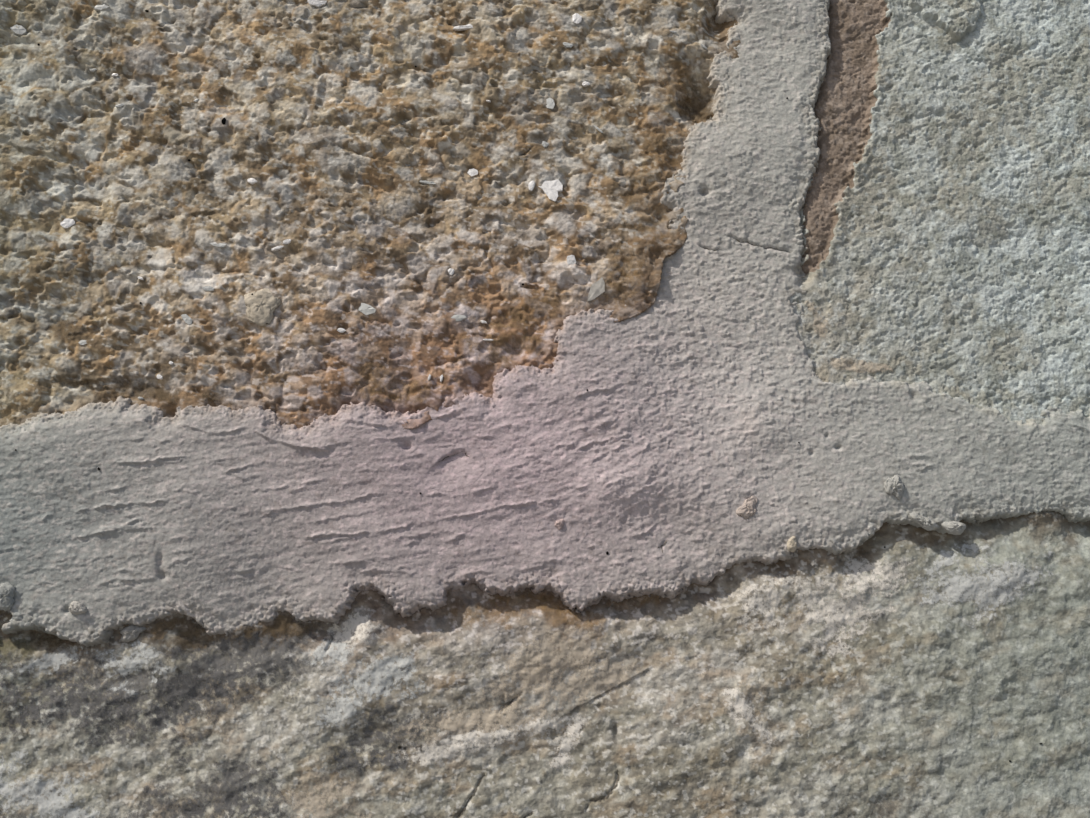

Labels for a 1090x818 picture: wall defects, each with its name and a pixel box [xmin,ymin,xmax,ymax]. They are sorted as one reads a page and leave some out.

peeling [307,0,327,8]
peeling [10,24,28,36]
peeling [801,0,892,275]
peeling [528,180,563,202]
peeling [60,218,76,229]
peeling [358,303,376,316]